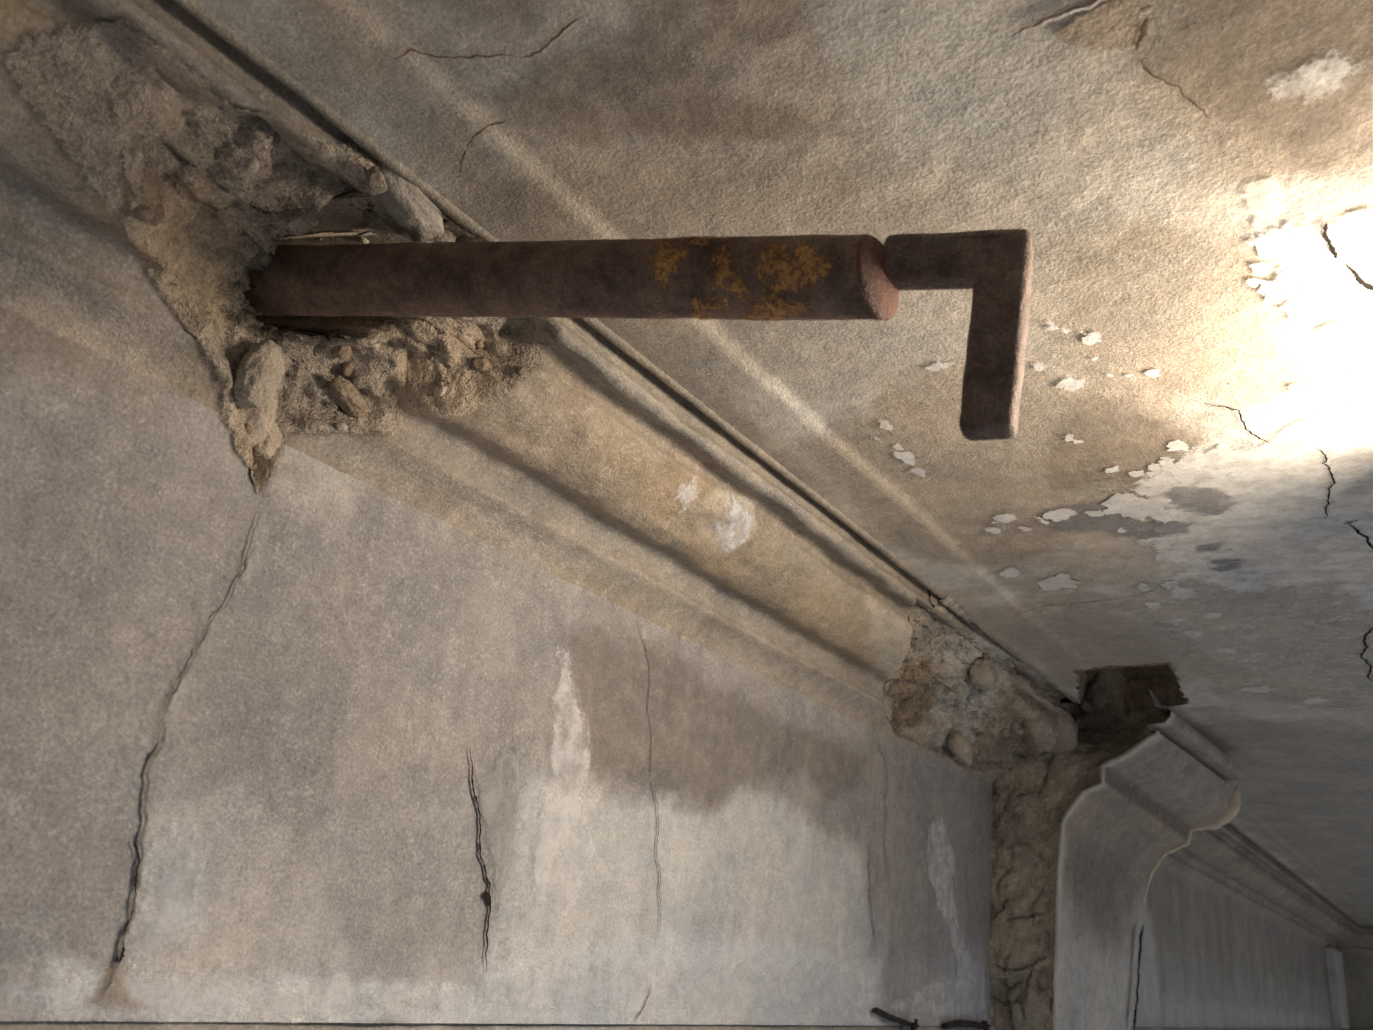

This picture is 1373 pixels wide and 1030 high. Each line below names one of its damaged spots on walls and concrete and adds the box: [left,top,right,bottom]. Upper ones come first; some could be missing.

water stain [1267,53,1362,103]
spalling [0,14,555,495]
corrosion [648,235,832,321]
peeling [1046,321,1104,361]
peeling [1247,262,1344,335]
crack [1322,222,1373,290]
crack [1204,402,1270,444]
peeling [984,440,1231,539]
crack [1316,447,1373,549]
spalling [883,591,1085,771]
crack [98,511,262,1001]
crack [470,747,491,972]